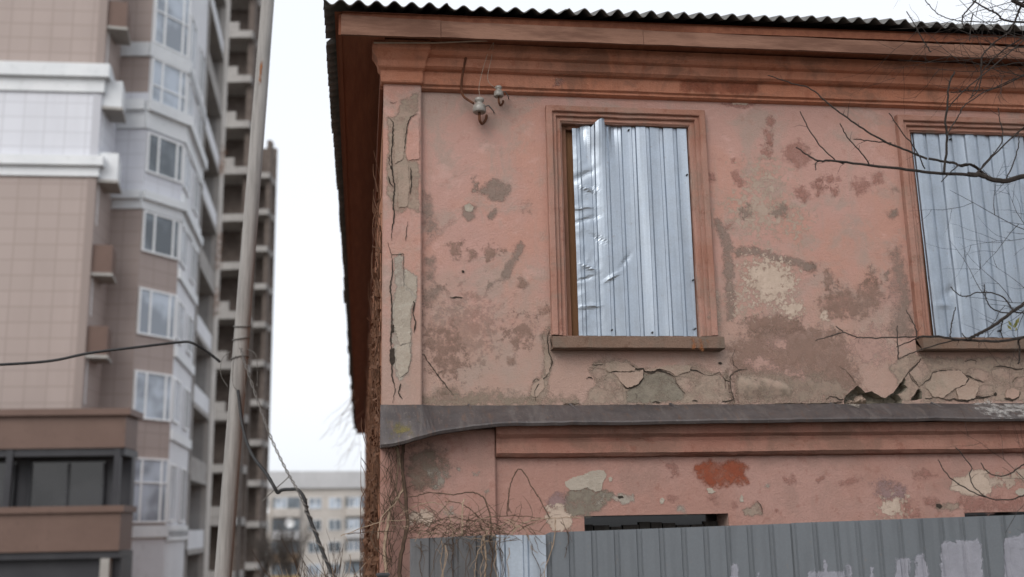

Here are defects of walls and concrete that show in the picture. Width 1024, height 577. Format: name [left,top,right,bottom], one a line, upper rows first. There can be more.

peeling [386,93,420,213]
peeling [463,177,511,221]
peeling [450,241,527,288]
peeling [708,218,815,349]
peeling [392,253,417,381]
crack [532,329,553,401]
crack [588,350,747,405]
crack [776,366,855,404]
flaking render [841,321,1024,404]
crack [905,359,1024,402]
peeling [544,470,634,532]
flaking render [873,467,1024,520]